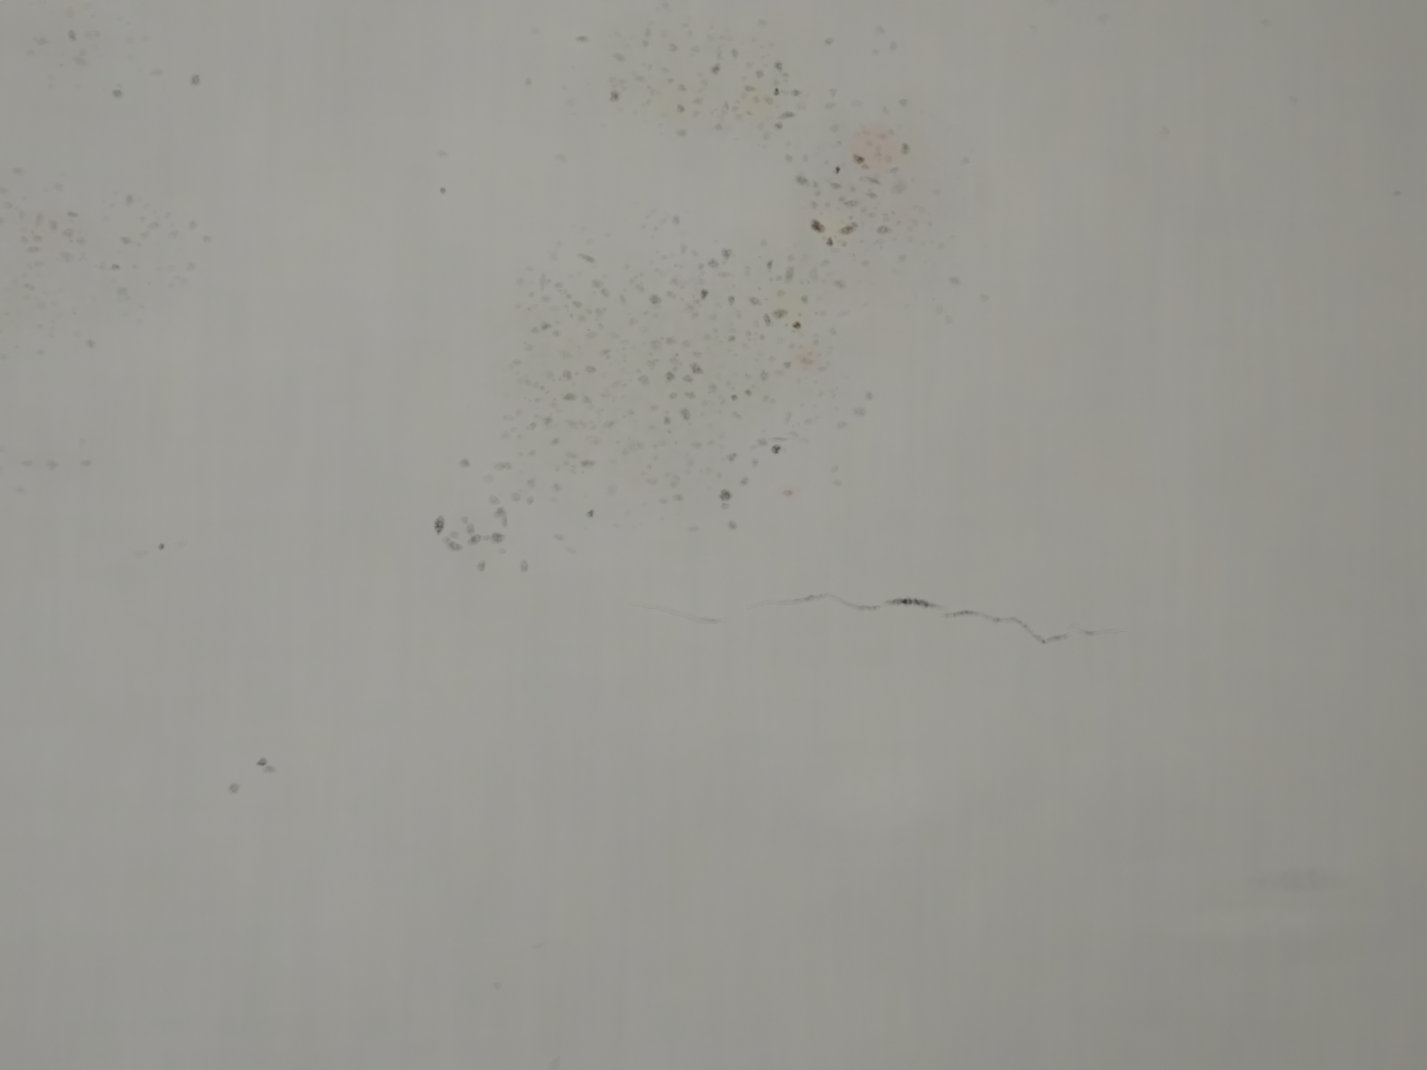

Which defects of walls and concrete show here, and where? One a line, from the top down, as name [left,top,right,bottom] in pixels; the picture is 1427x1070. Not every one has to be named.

leakage [435,0,891,576]
crack [629,592,1126,644]